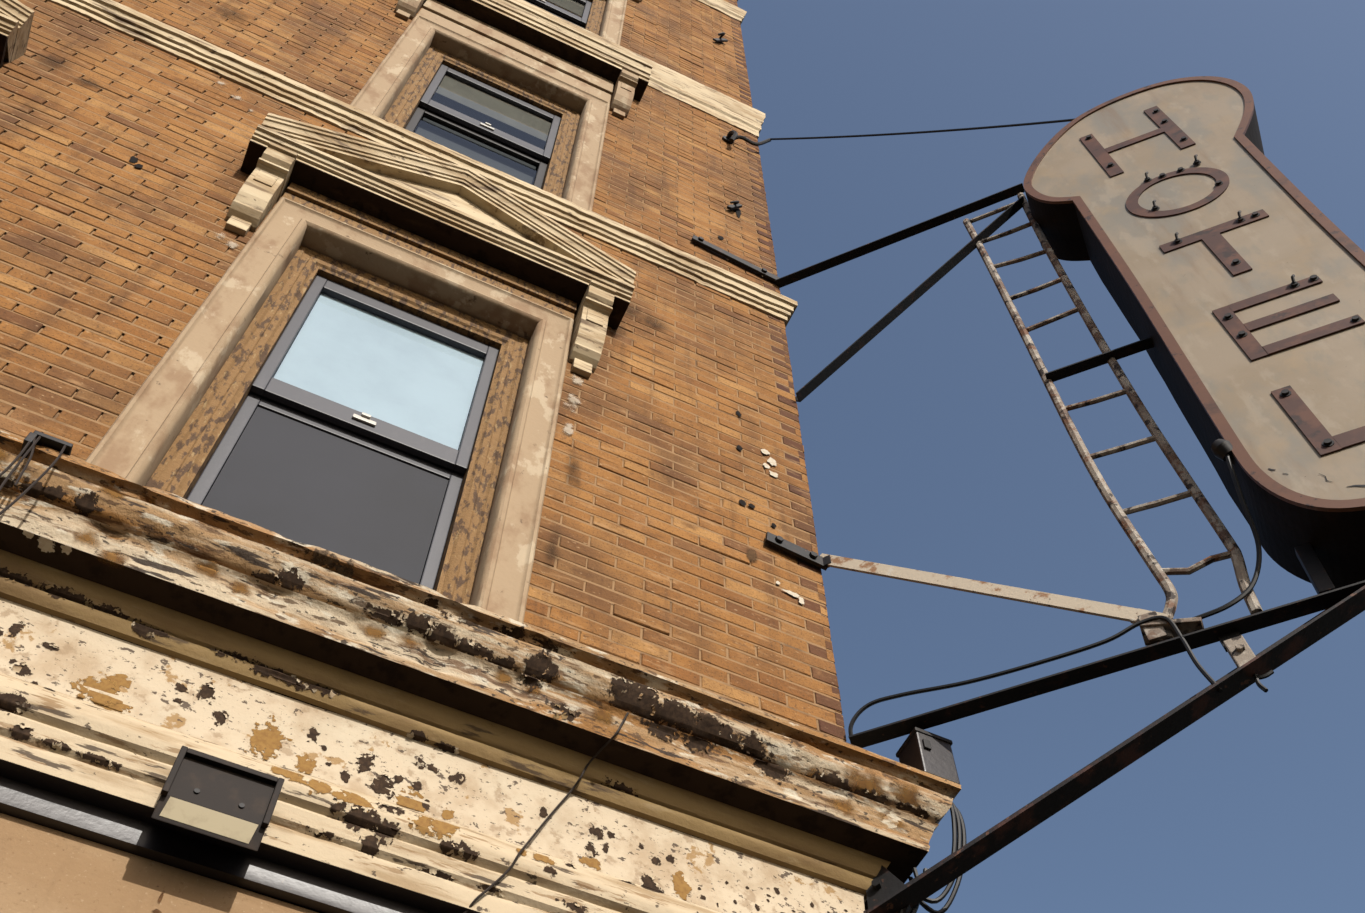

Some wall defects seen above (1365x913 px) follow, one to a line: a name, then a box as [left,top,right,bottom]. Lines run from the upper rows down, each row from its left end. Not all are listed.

peeling [0,567,170,639]
peeling [0,659,122,772]
peeling [69,674,133,714]
peeling [173,678,229,726]
peeling [208,648,341,699]
peeling [363,596,560,692]
peeling [548,701,582,723]
peeling [604,675,930,820]
peeling [244,715,480,862]
peeling [415,864,455,881]
peeling [516,826,616,874]
peeling [621,843,737,913]